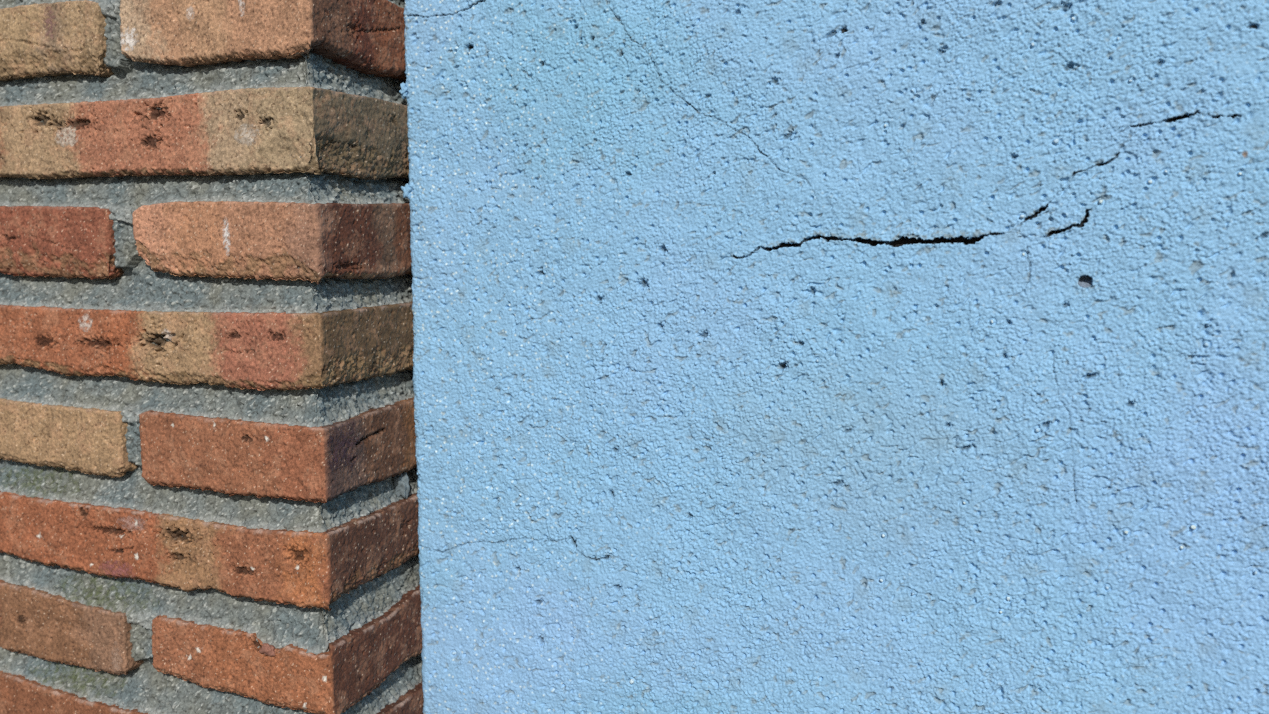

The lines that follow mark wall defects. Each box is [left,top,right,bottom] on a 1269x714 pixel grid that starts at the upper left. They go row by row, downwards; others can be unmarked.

crack [1134,114,1237,127]
crack [734,204,1089,258]